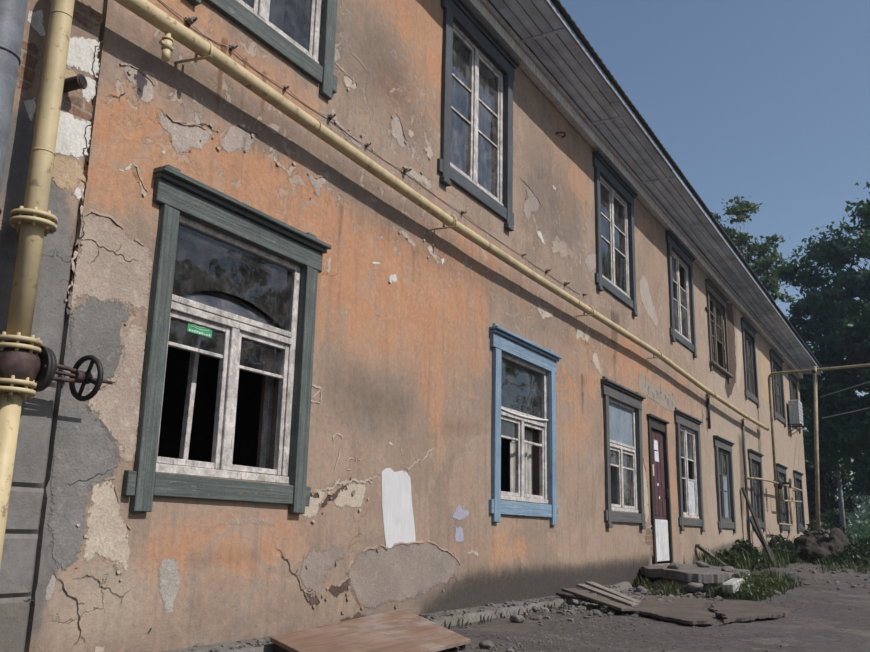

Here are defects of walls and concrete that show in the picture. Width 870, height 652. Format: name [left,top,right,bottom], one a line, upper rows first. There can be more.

crack [68,14,138,296]
spalling [120,62,280,154]
spalling [308,172,328,199]
spalling [389,111,415,148]
spalling [74,476,131,581]
spalling [303,477,369,523]
crack [54,570,127,646]
spalling [158,557,181,614]
crack [276,547,313,605]
spalling [303,540,478,621]